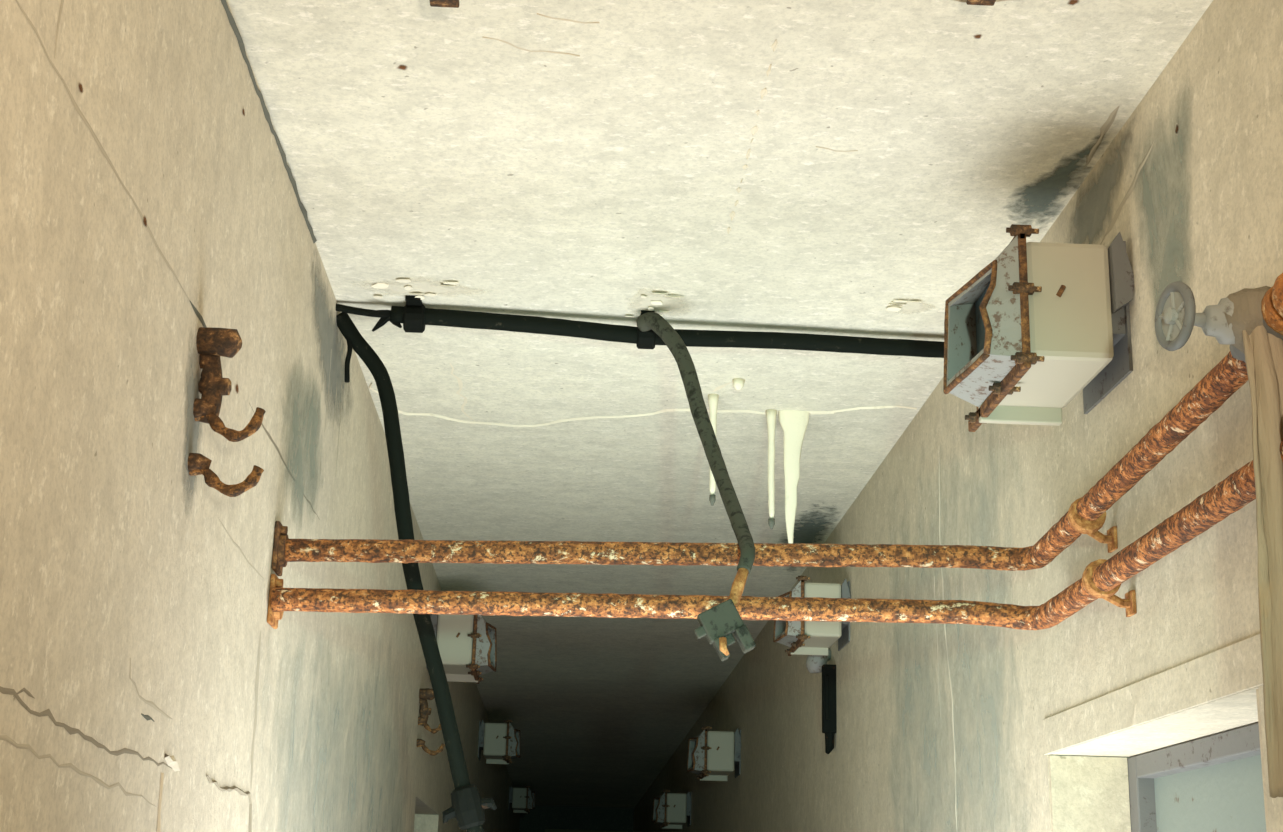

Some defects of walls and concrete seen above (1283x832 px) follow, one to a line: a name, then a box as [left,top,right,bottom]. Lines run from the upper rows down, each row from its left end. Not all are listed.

leakage [1011,106,1186,307]
leakage [287,274,345,507]
crack [0,686,172,807]
crack [130,658,173,722]
crack [206,775,252,832]